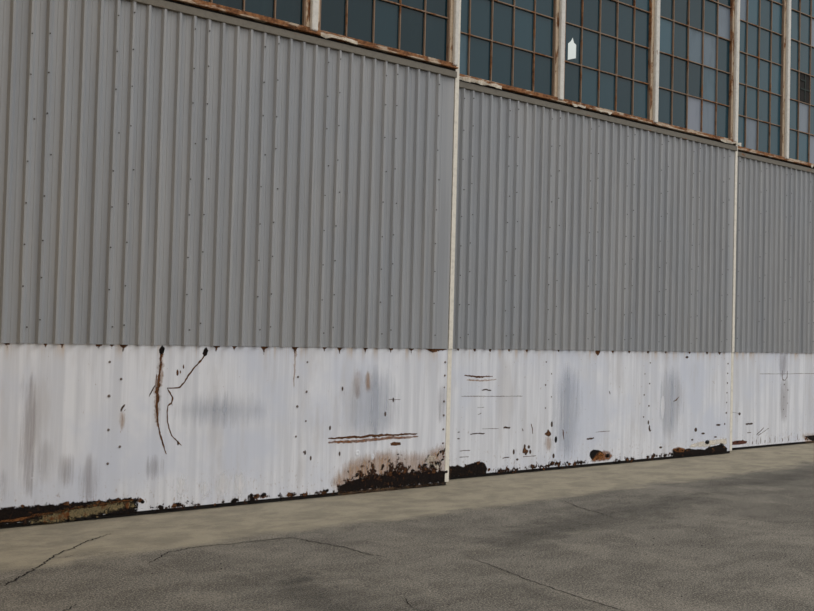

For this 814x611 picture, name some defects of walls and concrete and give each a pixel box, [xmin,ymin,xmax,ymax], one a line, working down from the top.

corrosion [149,346,167,454]
crack [167,348,208,446]
corrosion [214,433,757,507]
corrosion [0,497,200,526]
crack [5,534,108,586]